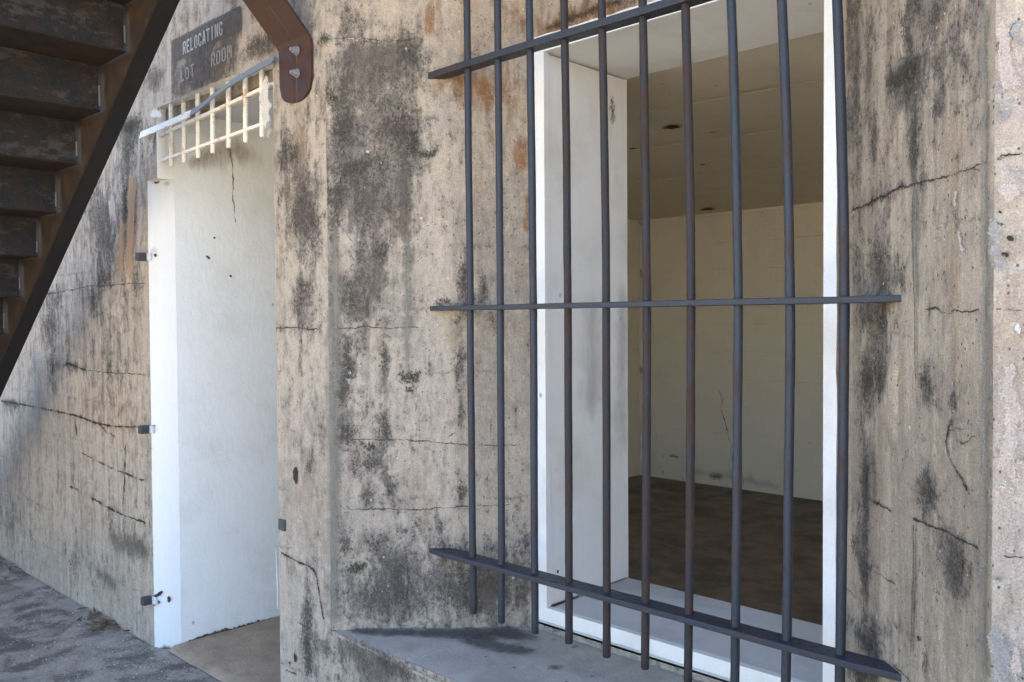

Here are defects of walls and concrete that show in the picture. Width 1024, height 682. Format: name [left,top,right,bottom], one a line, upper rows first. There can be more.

damp [885,4,939,101]
damp [388,102,439,158]
crack [852,153,1022,211]
damp [286,85,393,618]
damp [912,191,954,426]
crack [926,306,1022,314]
crack [1,400,145,526]
crack [945,396,976,495]
damp [849,452,875,609]
crack [862,496,978,549]
crack [281,552,324,627]
damp [298,596,325,681]